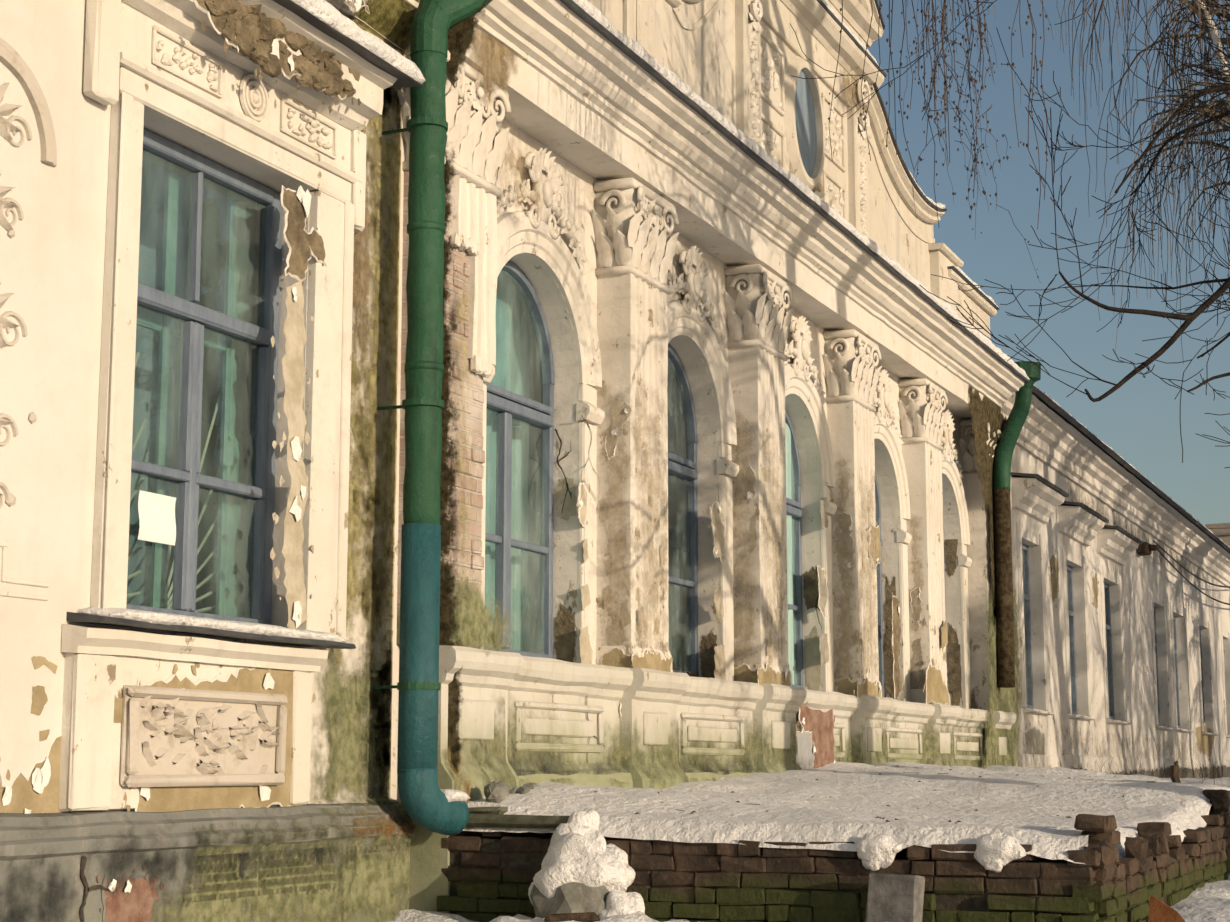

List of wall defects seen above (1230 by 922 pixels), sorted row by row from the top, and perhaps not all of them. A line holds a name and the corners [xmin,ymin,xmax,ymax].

spalling [193,0,361,121]
water stain [351,13,410,56]
water stain [473,27,517,95]
spalling [270,181,327,631]
water stain [346,87,404,813]
spalling [554,465,962,706]
spalling [0,729,62,814]
spalling [123,662,311,812]
water stain [684,755,759,782]
spalling [796,706,838,769]
water stain [1,872,74,922]
water stain [107,831,339,885]